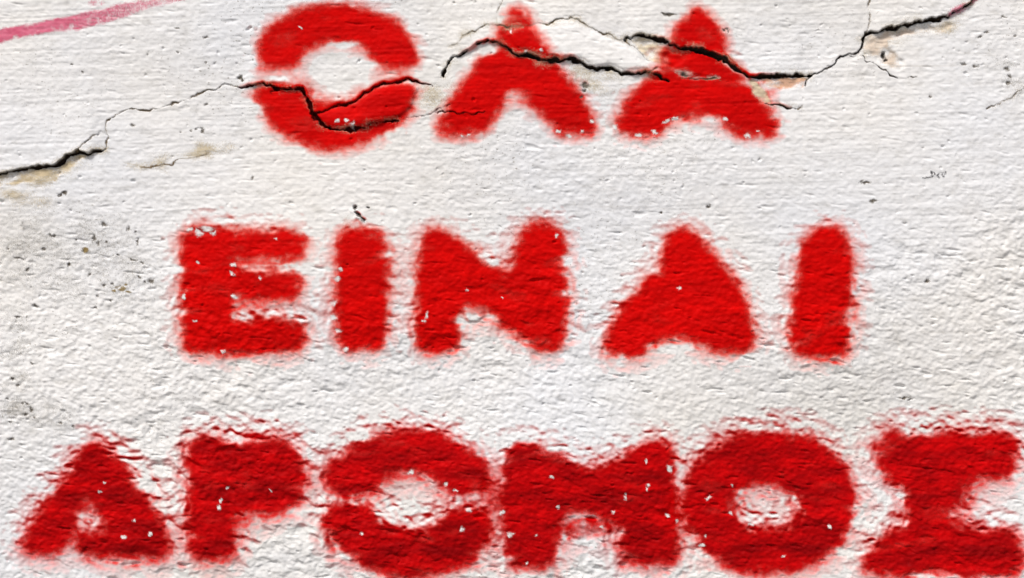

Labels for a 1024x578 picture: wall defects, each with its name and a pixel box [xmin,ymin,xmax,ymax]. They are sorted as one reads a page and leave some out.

crack [0,0,974,179]